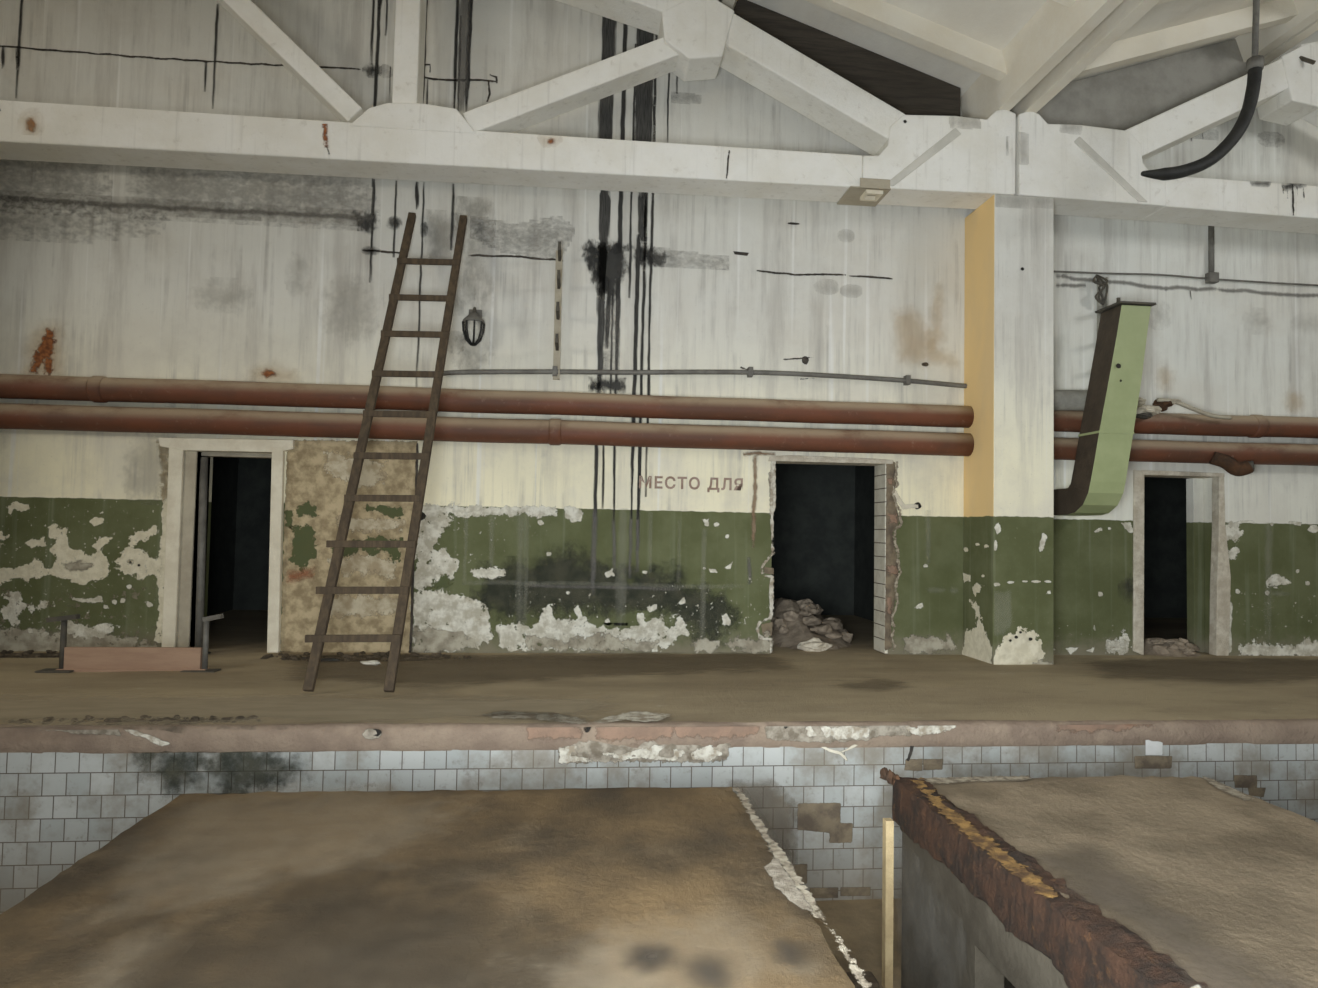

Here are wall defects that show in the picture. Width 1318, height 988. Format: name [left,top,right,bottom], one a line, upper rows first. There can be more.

water stain [601,16,657,61]
water stain [598,73,678,142]
corrosion [31,328,57,375]
water stain [582,190,666,395]
flaking render [0,441,169,651]
flaking render [280,439,776,654]
spalling [885,461,1133,665]
peeling [1229,589,1318,656]
water stain [134,752,299,794]
peeling [482,710,956,764]
spalling [733,788,872,988]
corrosion [892,777,1209,988]